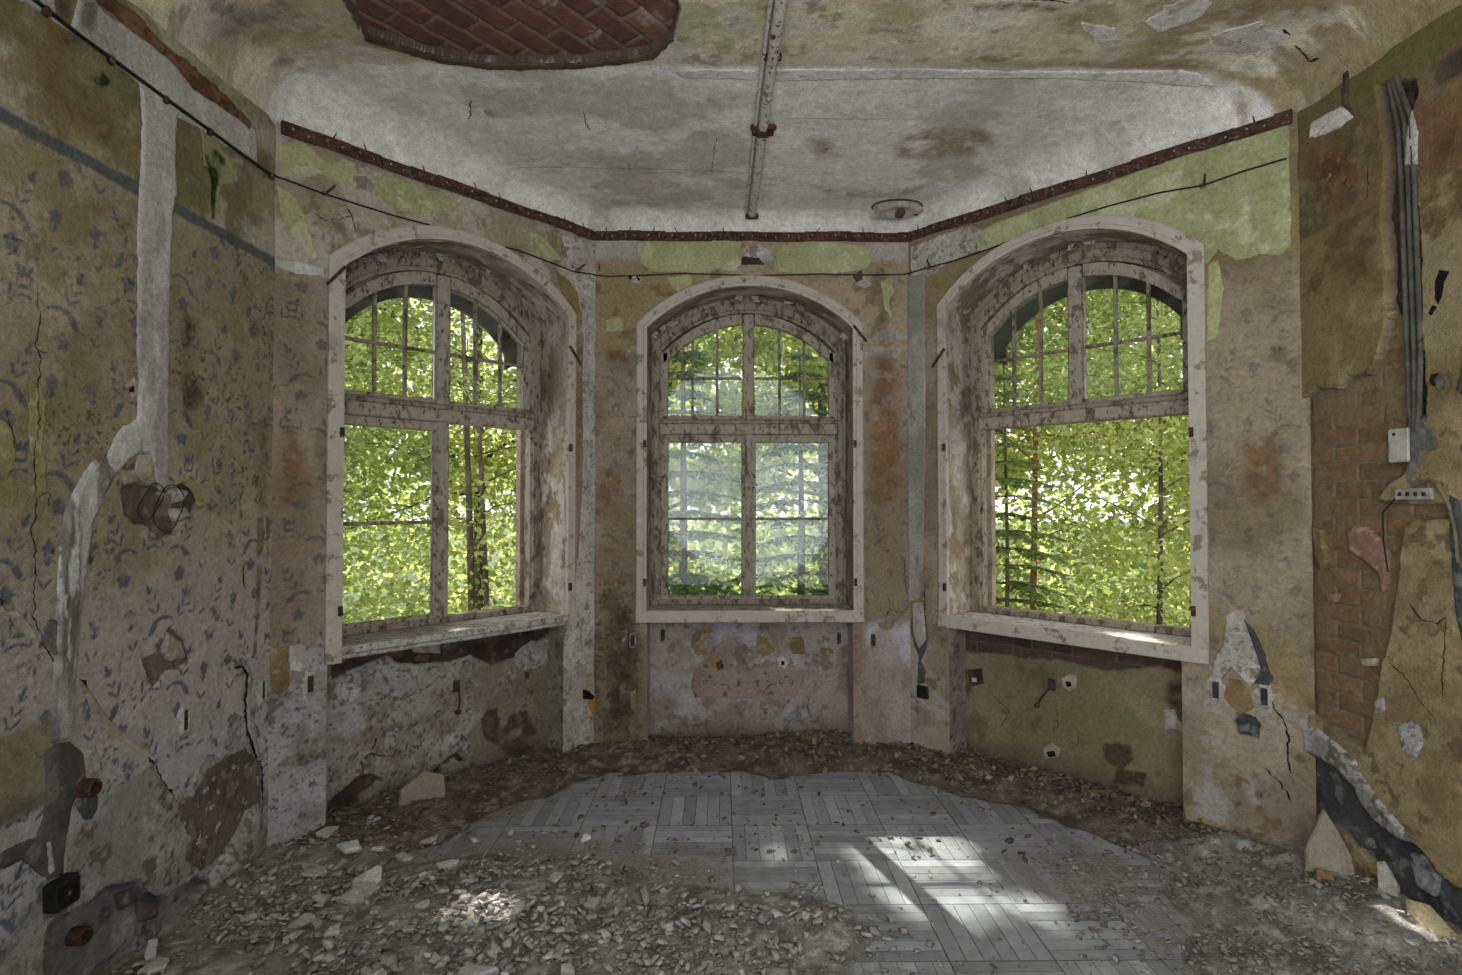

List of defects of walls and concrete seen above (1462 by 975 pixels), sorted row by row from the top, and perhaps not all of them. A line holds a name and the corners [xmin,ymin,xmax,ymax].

spalling [351,0,677,71]
spalling [1310,82,1449,746]
flaking render [120,484,195,537]
flaking render [141,627,188,687]
crack [234,657,264,812]
flaking render [256,628,549,708]
flaking render [1206,676,1276,737]
spalling [43,748,265,975]
spalling [1316,757,1462,930]